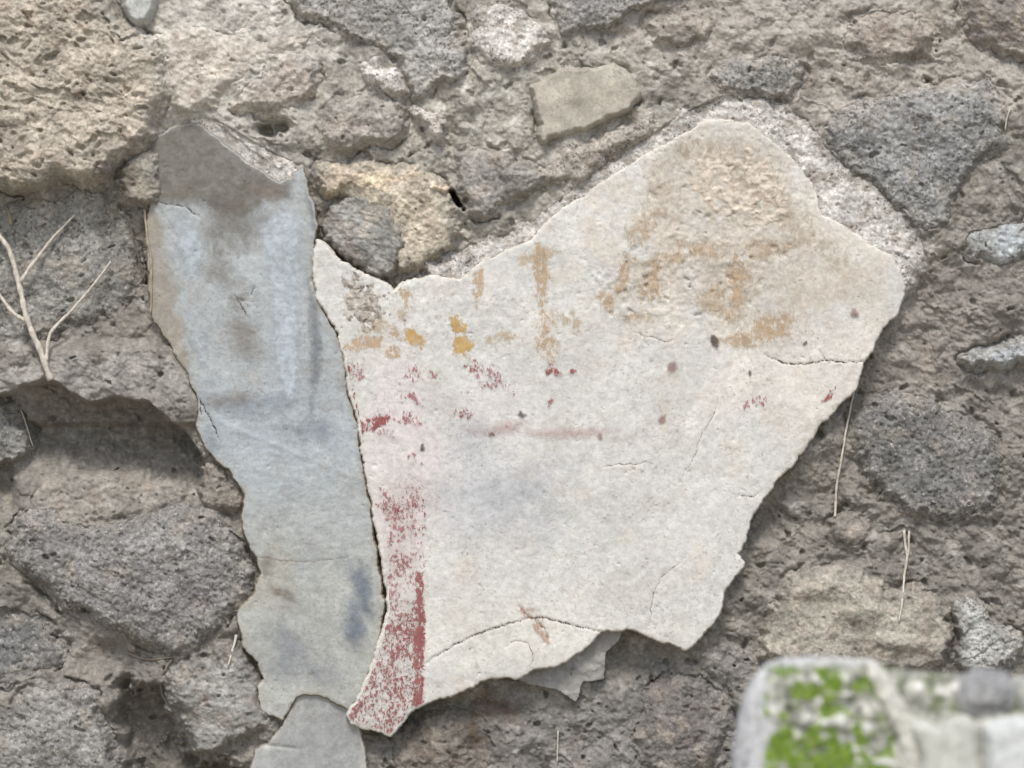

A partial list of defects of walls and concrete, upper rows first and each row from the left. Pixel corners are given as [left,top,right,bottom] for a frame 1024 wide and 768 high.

crack [767,355,861,365]
crack [429,612,594,662]